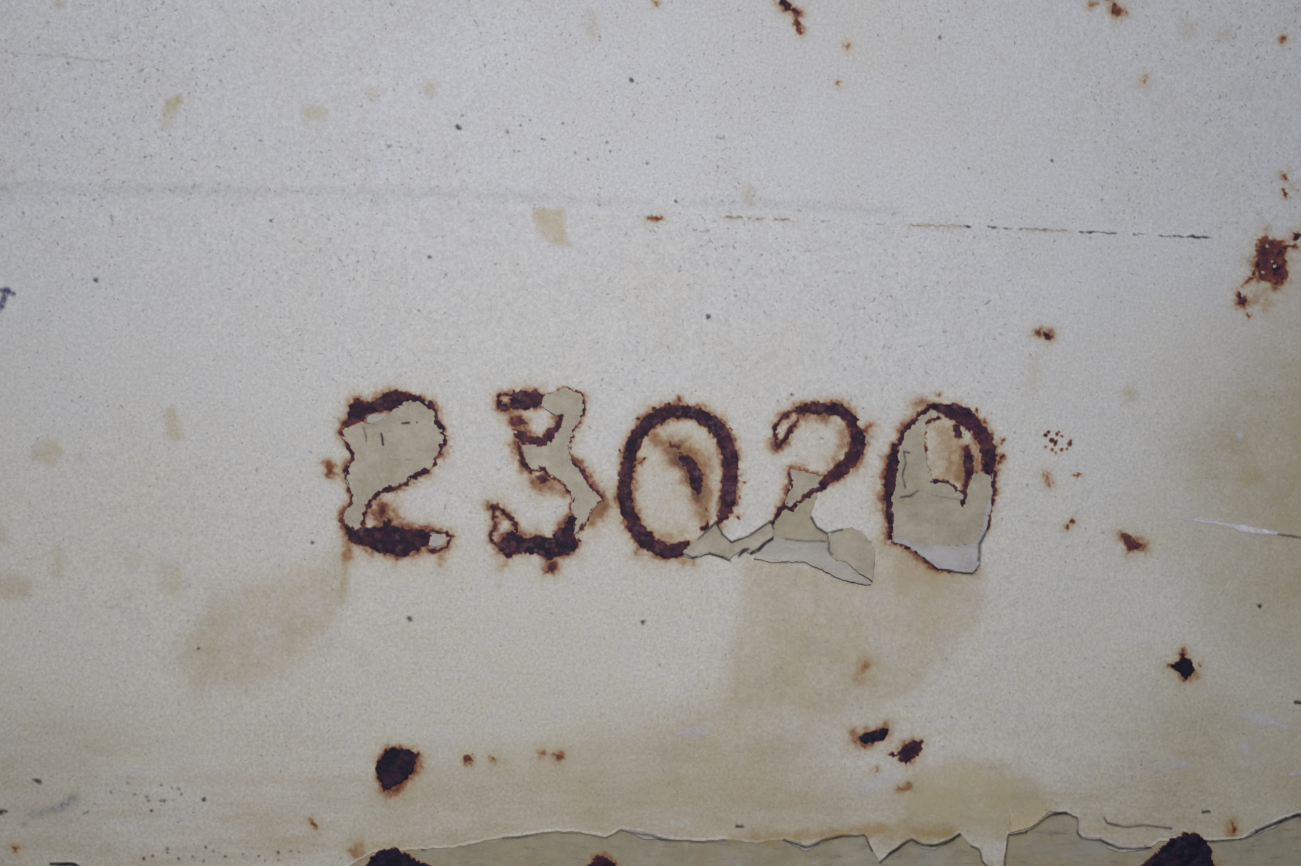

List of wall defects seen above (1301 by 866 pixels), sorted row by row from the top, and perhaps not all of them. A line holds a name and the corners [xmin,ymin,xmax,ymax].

corrosion [1235,232,1301,318]
peeling [366,413,386,424]
corrosion [485,386,746,575]
peeling [429,534,446,547]
peeling [683,524,875,585]
peeling [894,500,992,573]
peeling [344,808,1301,866]